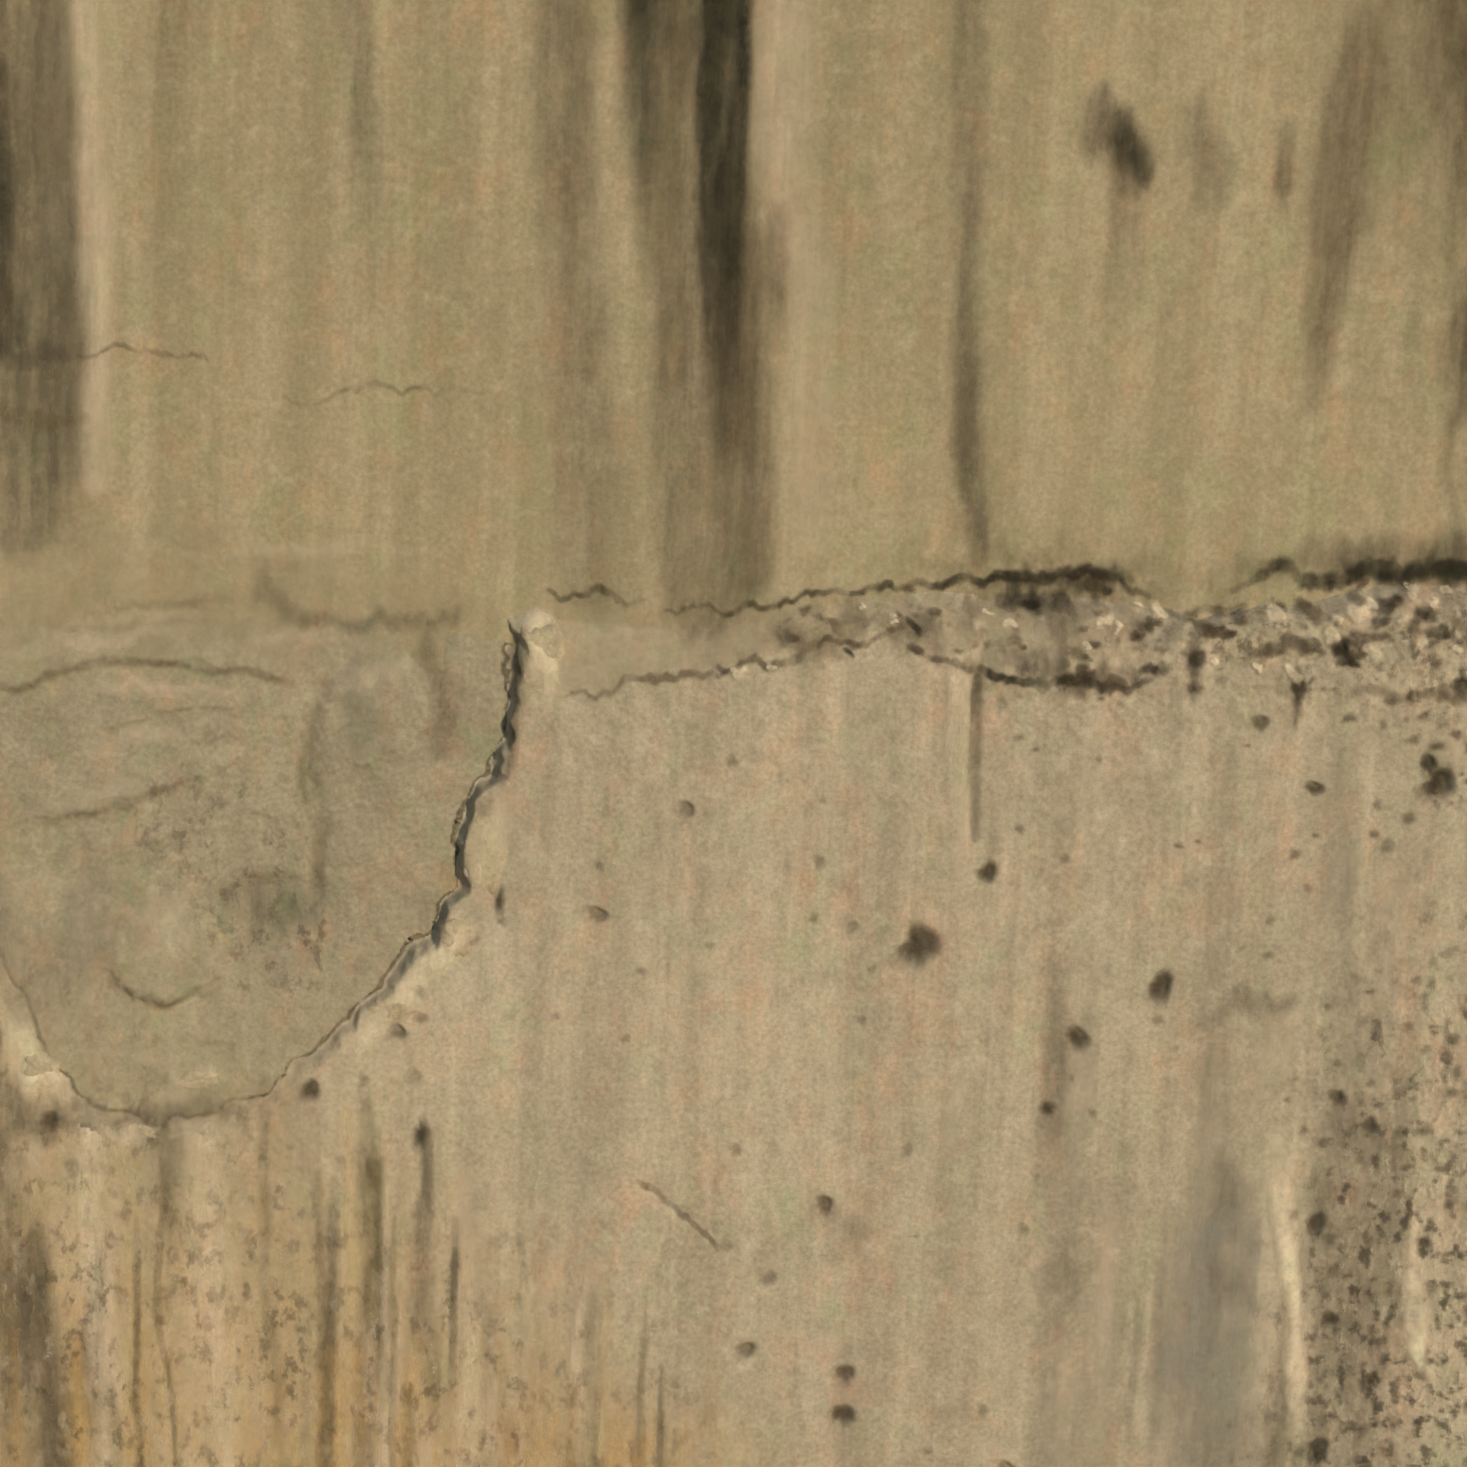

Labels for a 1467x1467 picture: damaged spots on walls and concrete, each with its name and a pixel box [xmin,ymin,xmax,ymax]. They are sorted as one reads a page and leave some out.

leakage [0,0,108,508]
leakage [630,0,798,361]
peeling [1097,616,1123,631]
spalling [1191,653,1219,665]
spalling [1286,665,1303,695]
peeling [1326,597,1377,650]
spalling [1391,622,1464,667]
spalling [0,616,566,1151]
leakage [0,1219,65,1467]
leakage [68,1127,102,1385]
leakage [345,1141,382,1326]
leakage [417,1129,432,1240]